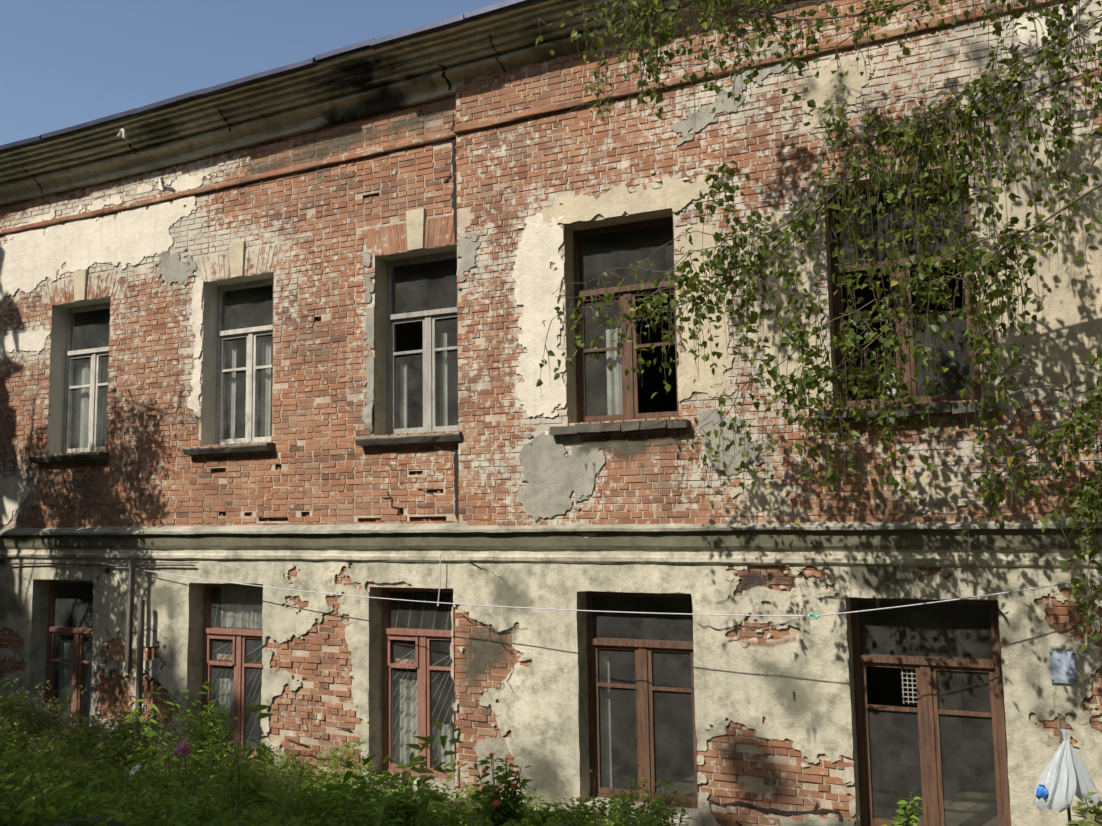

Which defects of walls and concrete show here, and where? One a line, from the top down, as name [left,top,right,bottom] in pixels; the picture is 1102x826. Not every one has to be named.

peeling [0,172,217,419]
peeling [457,233,481,289]
peeling [512,170,716,418]
peeling [676,192,831,524]
peeling [516,431,606,526]
spalling [0,622,33,678]
spalling [95,633,182,727]
spalling [266,565,363,786]
spalling [450,607,531,798]
spalling [697,721,859,826]
spalling [726,565,833,592]
spalling [1036,590,1102,746]